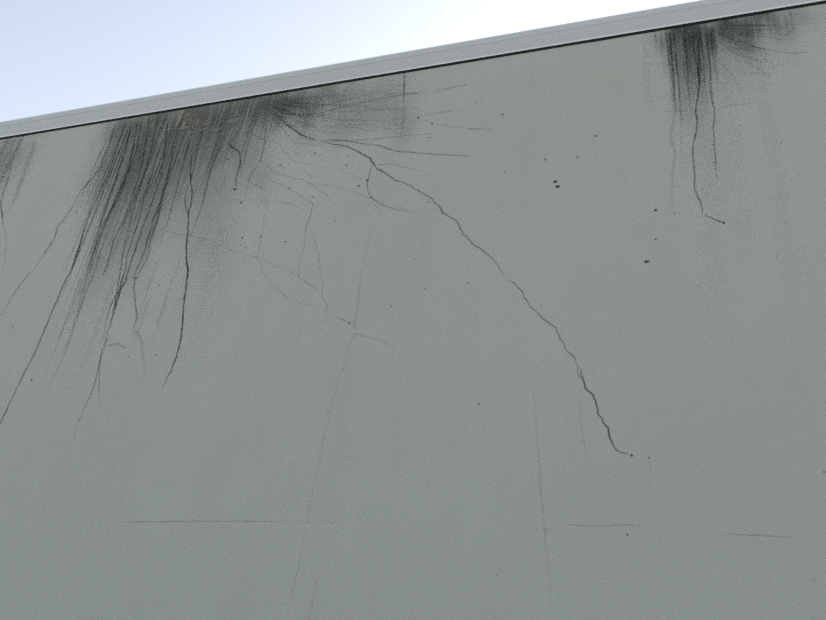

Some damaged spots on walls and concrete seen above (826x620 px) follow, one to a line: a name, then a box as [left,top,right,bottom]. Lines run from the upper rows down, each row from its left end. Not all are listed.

leakage [669,19,750,51]
leakage [139,95,293,148]
crack [308,137,391,177]
crack [581,374,618,451]